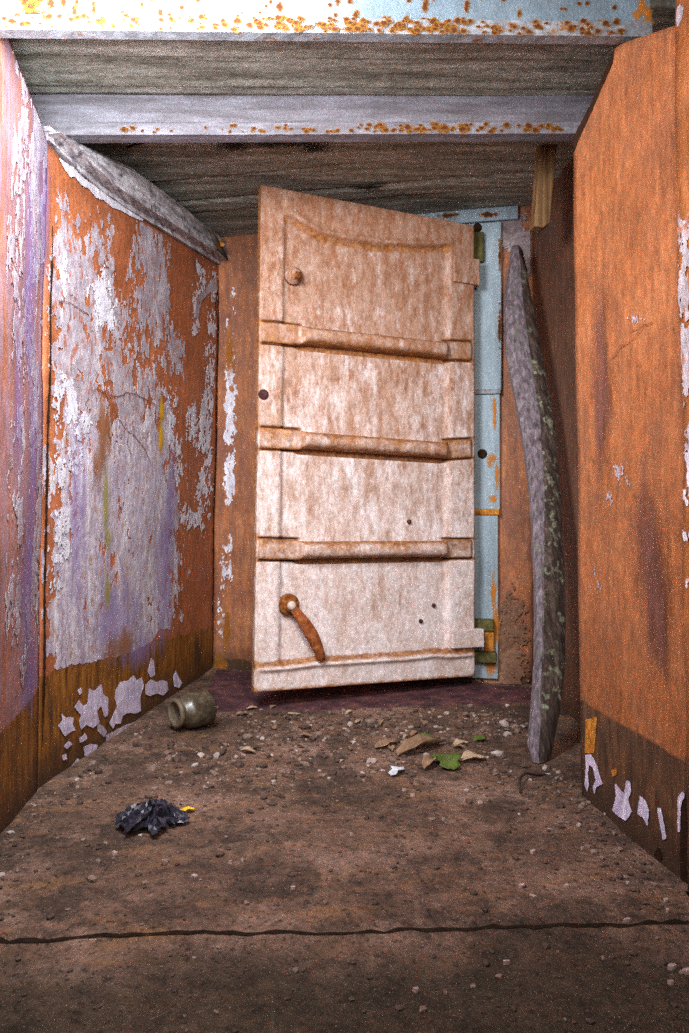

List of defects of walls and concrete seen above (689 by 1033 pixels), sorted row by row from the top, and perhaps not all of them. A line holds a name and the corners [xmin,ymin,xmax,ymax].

rust [1,0,550,36]
rust [560,1,626,37]
peeling [676,3,684,27]
rust [222,121,563,134]
peeling [677,210,689,407]
peeling [5,51,238,687]
peeling [59,658,182,765]
peeling [585,717,688,884]
crack [0,891,689,943]